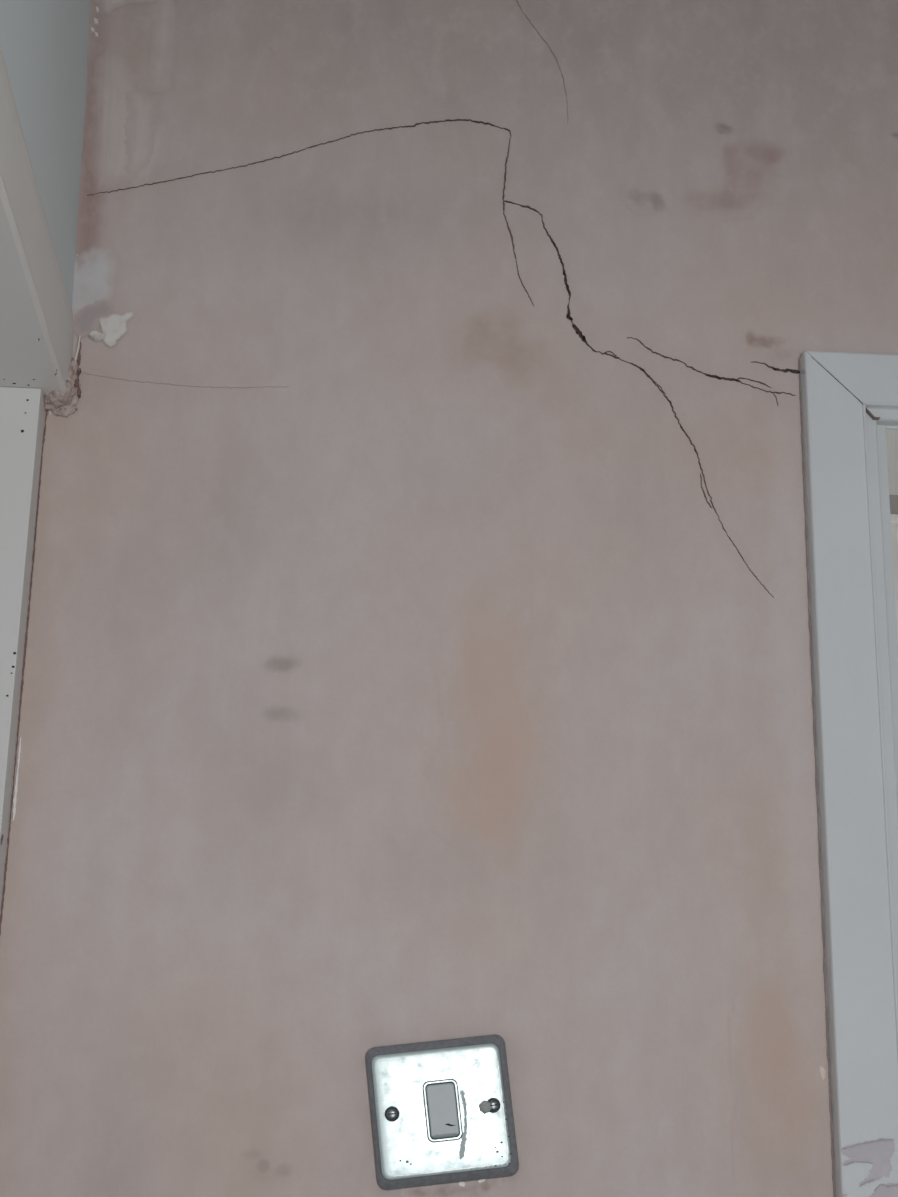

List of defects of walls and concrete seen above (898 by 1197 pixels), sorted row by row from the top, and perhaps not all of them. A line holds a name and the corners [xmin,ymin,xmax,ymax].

crack [81,119,835,1197]